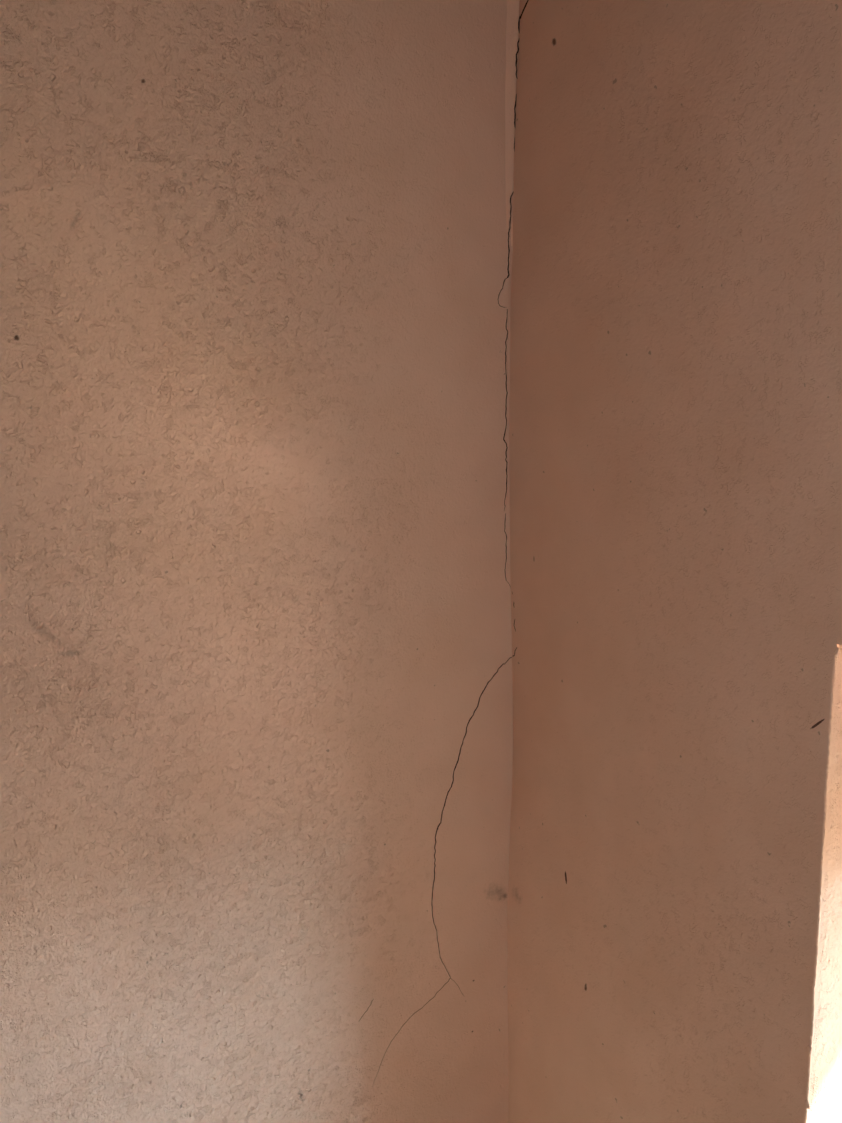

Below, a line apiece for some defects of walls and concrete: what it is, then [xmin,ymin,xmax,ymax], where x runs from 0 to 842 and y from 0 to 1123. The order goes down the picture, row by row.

crack [514,0,529,152]
crack [372,181,517,1088]